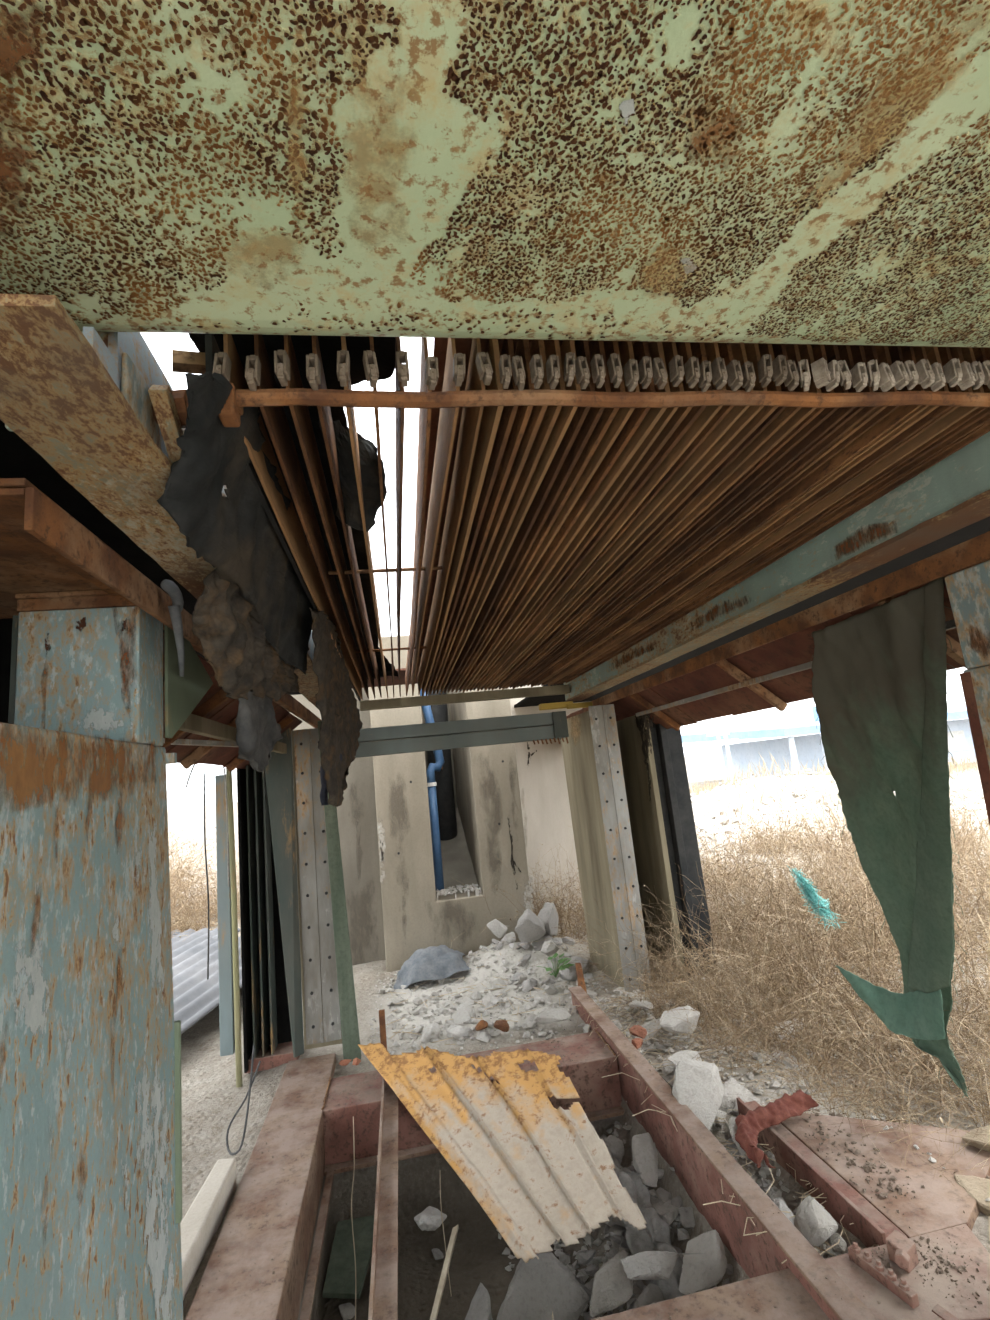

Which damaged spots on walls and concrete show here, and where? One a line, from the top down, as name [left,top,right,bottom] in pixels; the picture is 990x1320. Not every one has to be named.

rust [0,8,41,235]
rust [690,99,744,168]
rust [836,521,897,559]
rust [114,609,136,695]
rust [968,627,990,656]
rust [0,668,156,844]